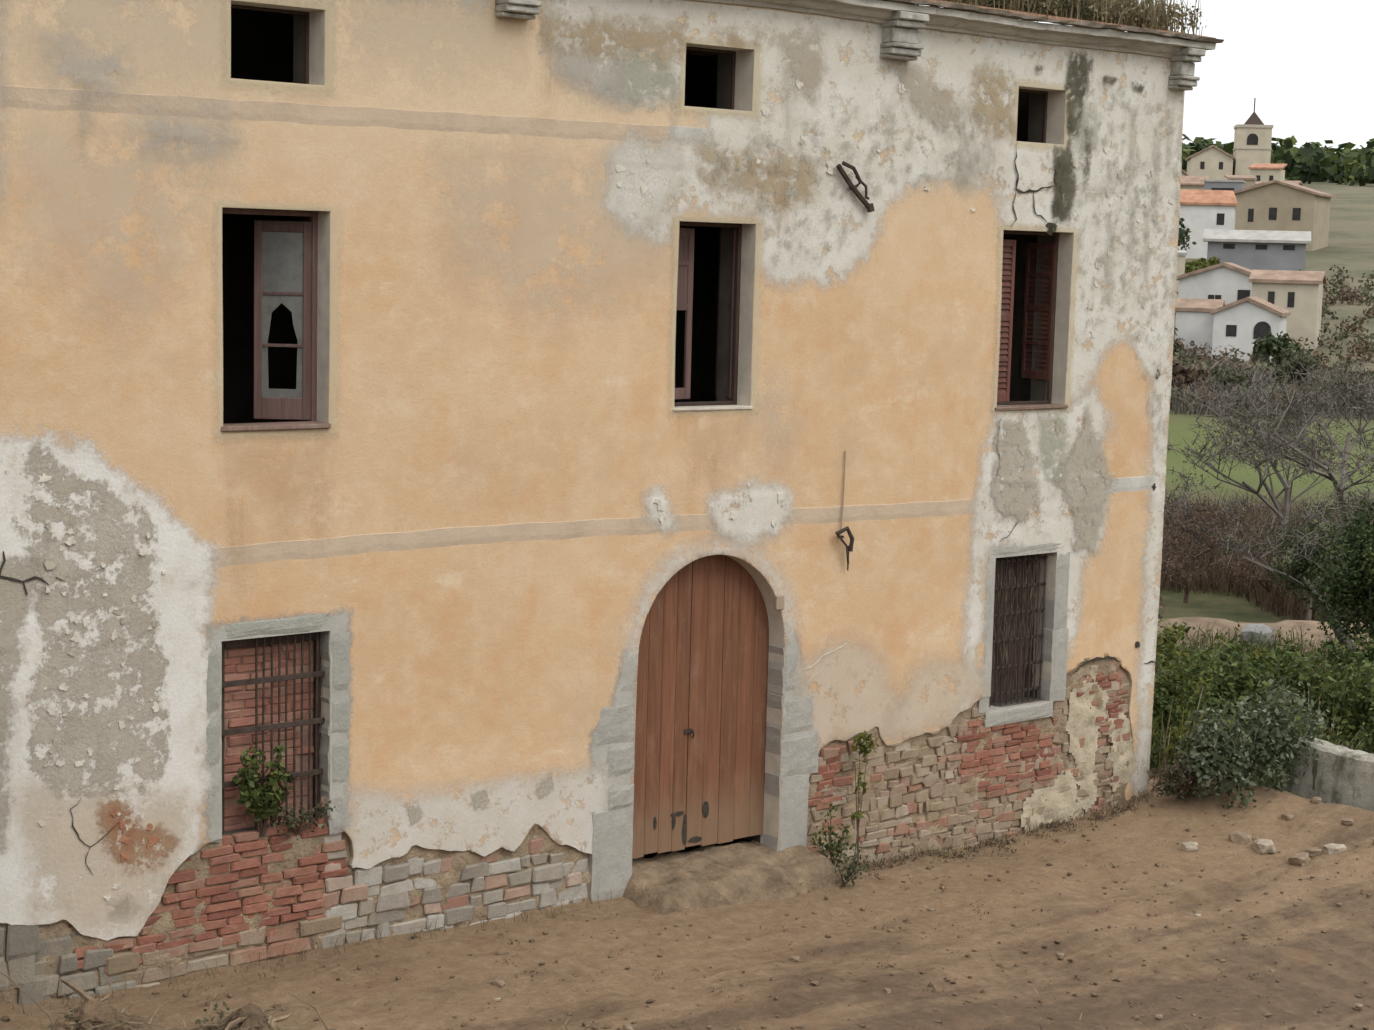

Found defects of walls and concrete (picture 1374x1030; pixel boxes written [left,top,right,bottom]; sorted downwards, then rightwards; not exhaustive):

crack [1011,145,1056,227]
peeling [541,0,1185,868]
crack [0,551,49,595]
peeling [0,430,611,1005]
crack [70,797,119,876]
rust [98,800,179,870]